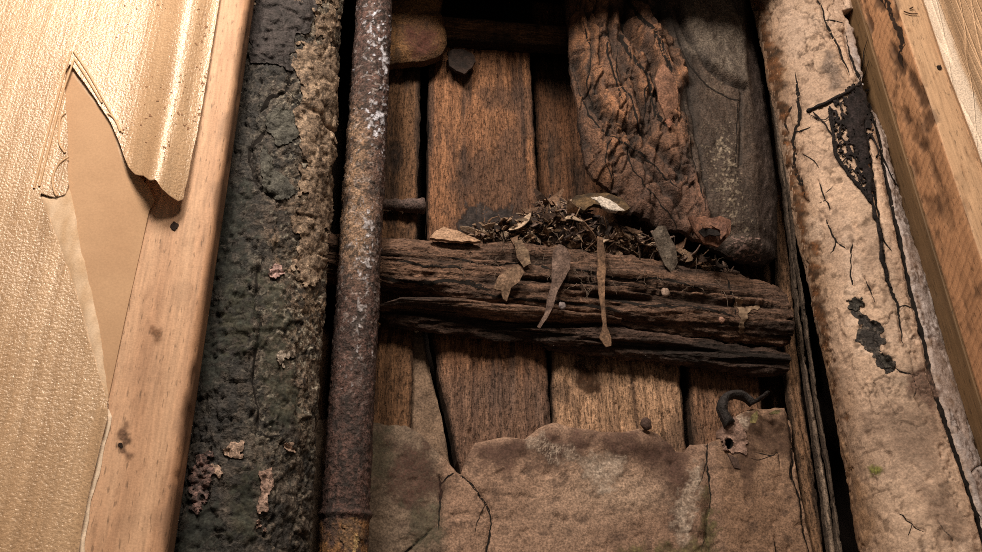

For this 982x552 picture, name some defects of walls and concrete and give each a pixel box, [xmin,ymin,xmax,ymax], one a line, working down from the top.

crack [817,0,861,80]
crack [880,0,905,68]
crack [784,74,982,543]
peeling [276,349,296,369]
peeling [187,440,245,515]
peeling [256,467,274,532]
corrosion [339,517,363,552]
crack [405,473,492,552]